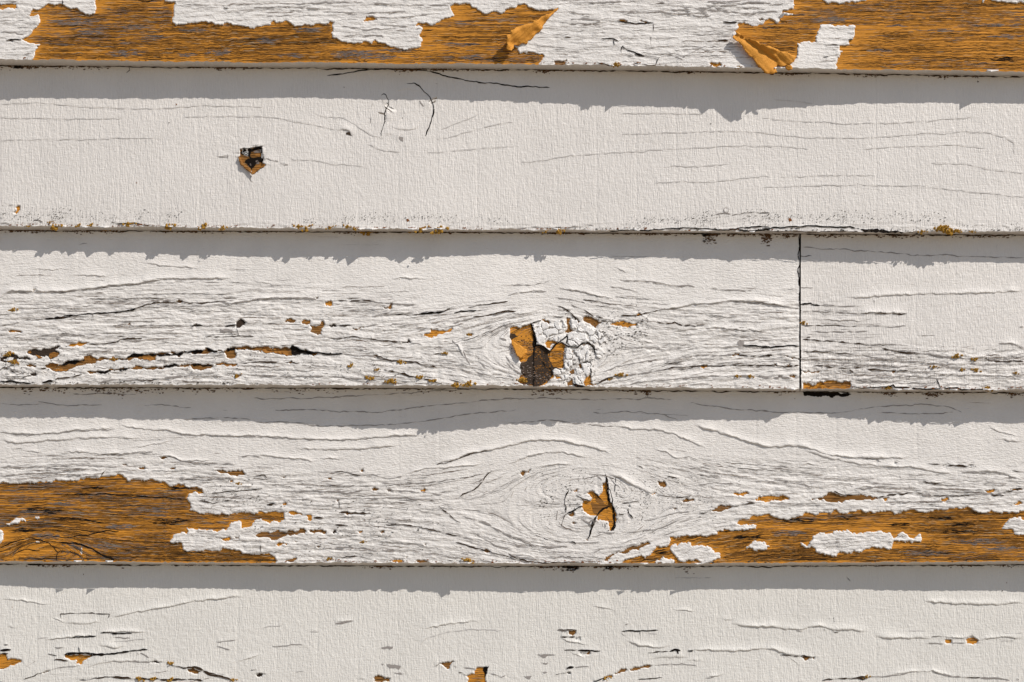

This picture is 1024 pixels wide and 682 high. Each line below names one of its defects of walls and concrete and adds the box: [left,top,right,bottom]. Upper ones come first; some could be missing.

peeling [9,0,567,65]
peeling [735,0,1024,72]
peeling [0,342,317,377]
peeling [510,313,640,386]
crack [0,254,1024,564]
peeling [0,464,337,563]
peeling [603,489,1024,564]
crack [0,612,235,682]
crack [537,629,603,682]
crack [622,623,715,680]
crack [782,630,907,681]
crack [943,673,1019,681]